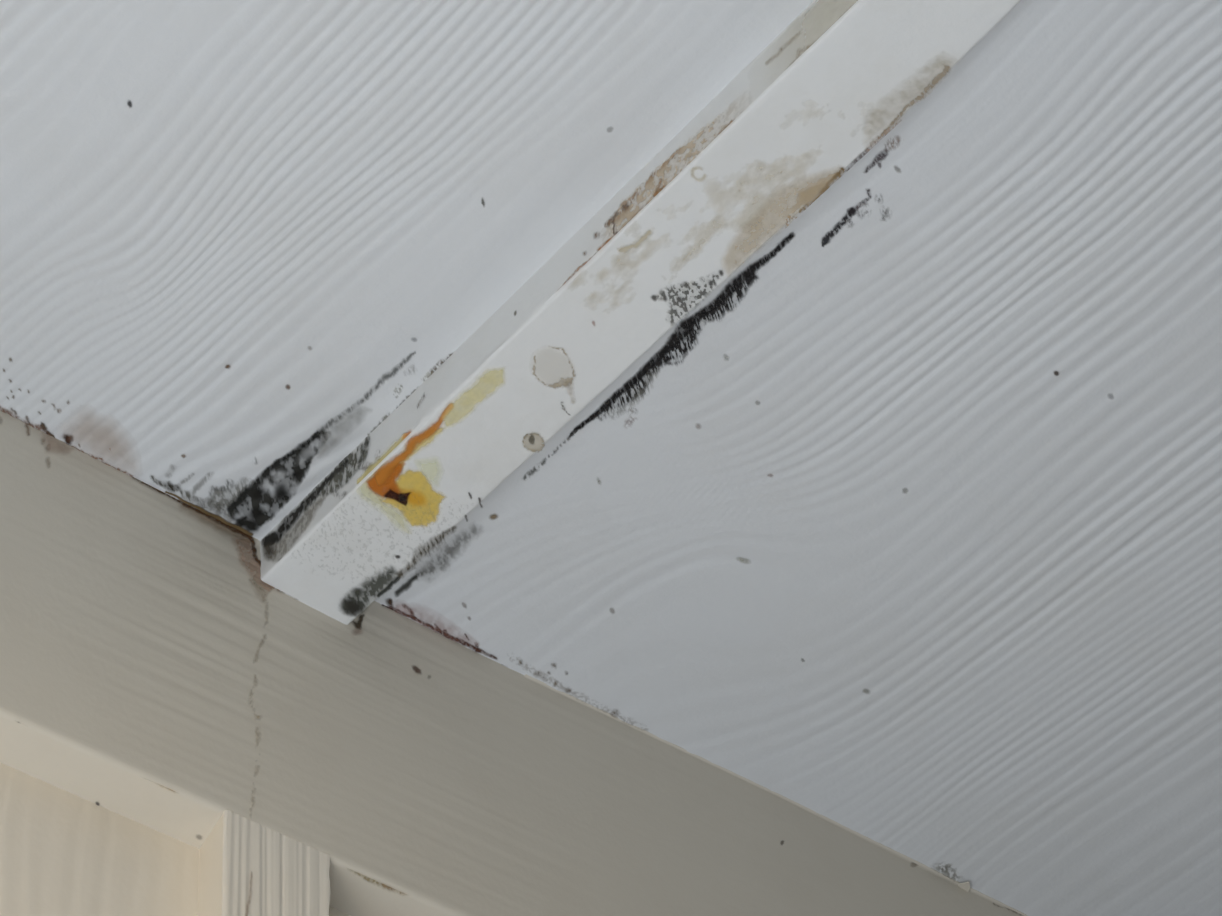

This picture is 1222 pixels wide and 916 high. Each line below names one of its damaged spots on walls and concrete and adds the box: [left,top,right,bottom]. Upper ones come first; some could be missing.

leakage [523,66,950,479]
leakage [0,358,133,477]
leakage [151,355,424,560]
rust [357,375,497,525]
mould [342,515,468,630]